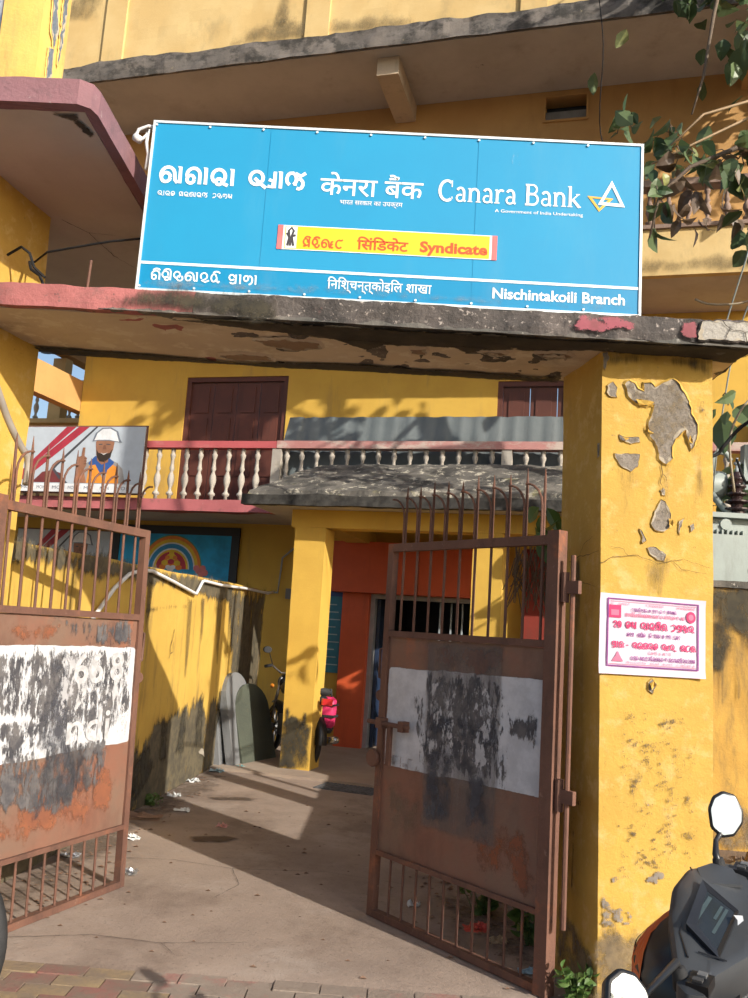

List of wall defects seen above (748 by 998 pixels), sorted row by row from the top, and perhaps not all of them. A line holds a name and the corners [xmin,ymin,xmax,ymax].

water stain [248,3,305,38]
water stain [124,288,276,321]
spalling [532,350,575,361]
spalling [696,319,748,343]
peeling [606,377,699,472]
peeling [639,487,695,562]
crack [569,538,709,574]
water stain [713,587,748,683]
water stain [130,692,253,820]
water stain [279,709,311,769]
water stain [0,832,117,902]
peeling [602,897,633,927]